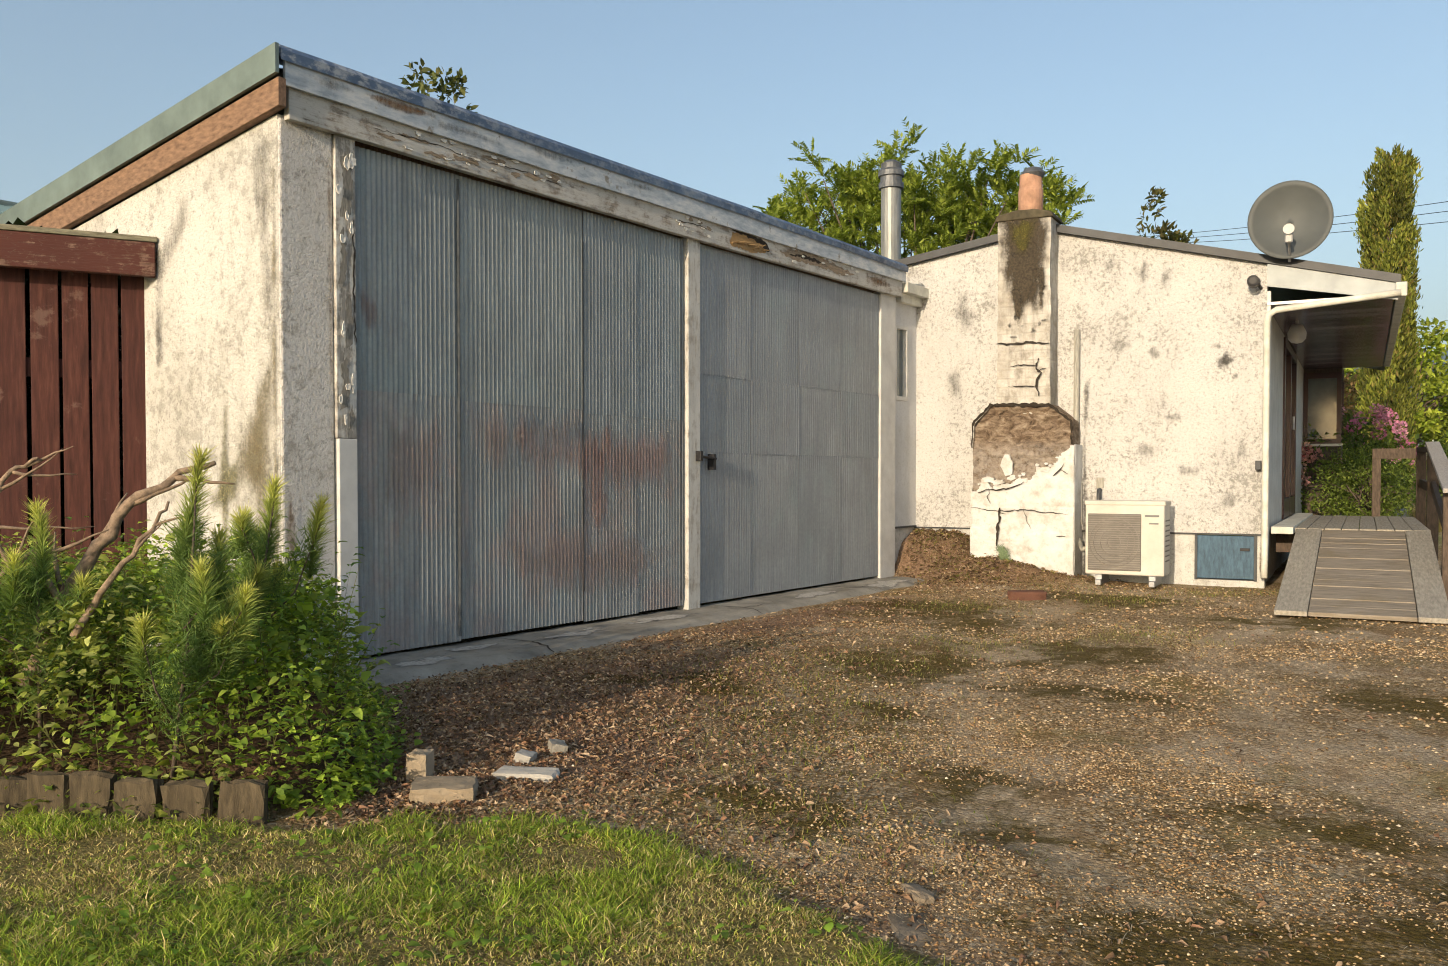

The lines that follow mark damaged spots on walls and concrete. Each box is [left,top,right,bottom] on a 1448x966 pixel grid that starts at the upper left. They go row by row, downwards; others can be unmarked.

peeling [375,128,561,186]
peeling [336,150,357,430]
peeling [676,216,712,238]
peeling [733,230,859,276]
leakage [1000,217,1048,319]
crack [998,341,1048,396]
leakage [216,340,277,561]
flaking render [971,402,1073,491]
crack [971,464,1067,546]